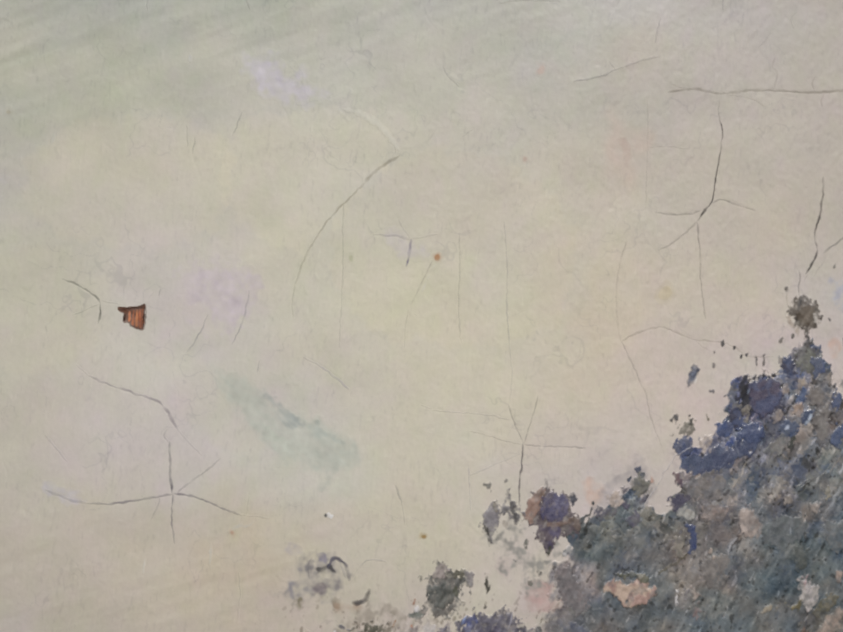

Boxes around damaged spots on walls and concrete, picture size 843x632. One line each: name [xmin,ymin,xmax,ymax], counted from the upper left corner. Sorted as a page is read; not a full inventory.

crack [655,57,843,319]
crack [45,364,268,544]
crack [470,221,586,506]
peeling [333,284,843,632]
crack [615,240,774,447]